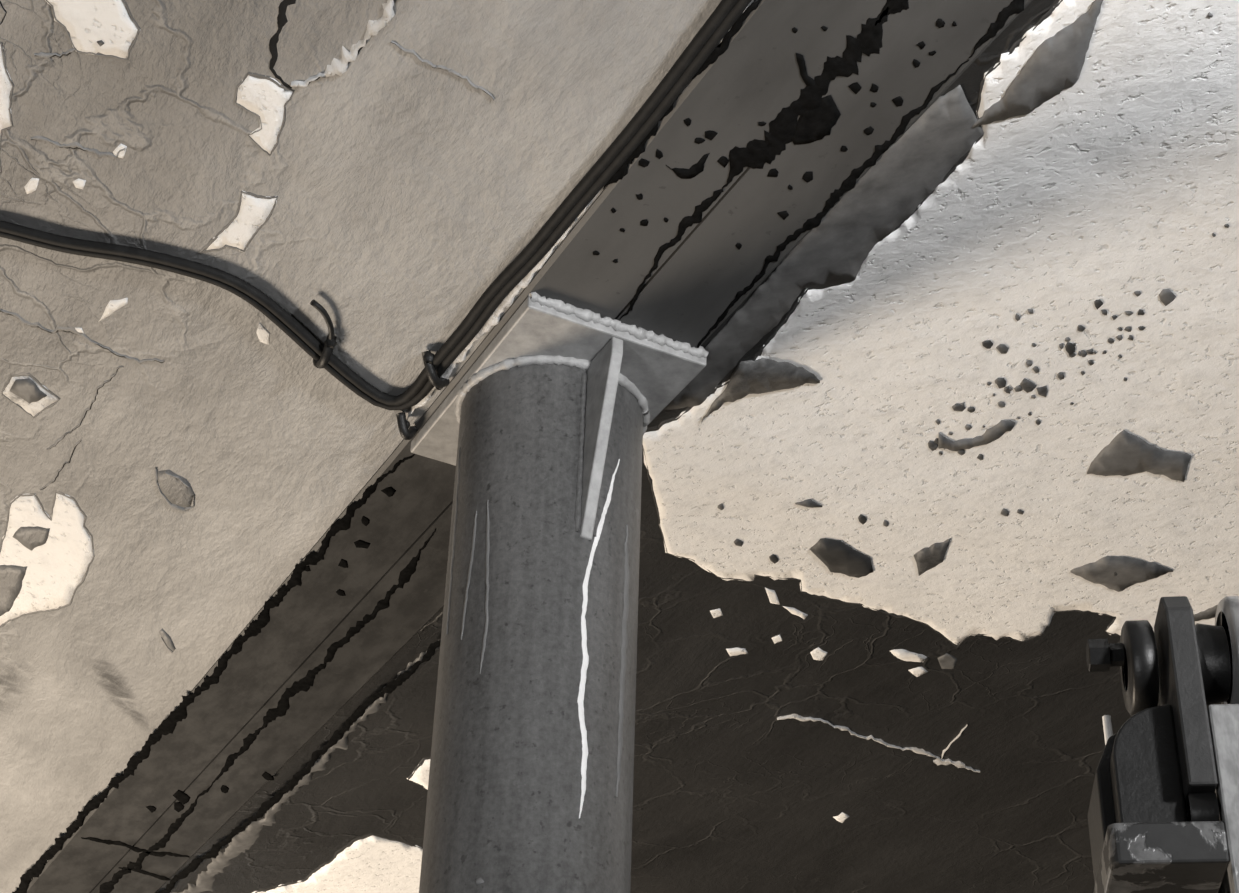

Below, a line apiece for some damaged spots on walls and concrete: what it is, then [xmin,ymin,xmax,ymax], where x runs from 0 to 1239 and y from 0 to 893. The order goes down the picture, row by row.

peeling [0,42,14,173]
crack [34,48,76,58]
crack [31,135,127,159]
peeling [45,0,141,60]
crack [269,0,494,100]
crack [0,309,165,490]
spalling [406,205,588,420]
spalling [642,0,1239,677]
peeling [0,490,94,628]
spalling [173,639,441,893]
crack [777,714,980,772]